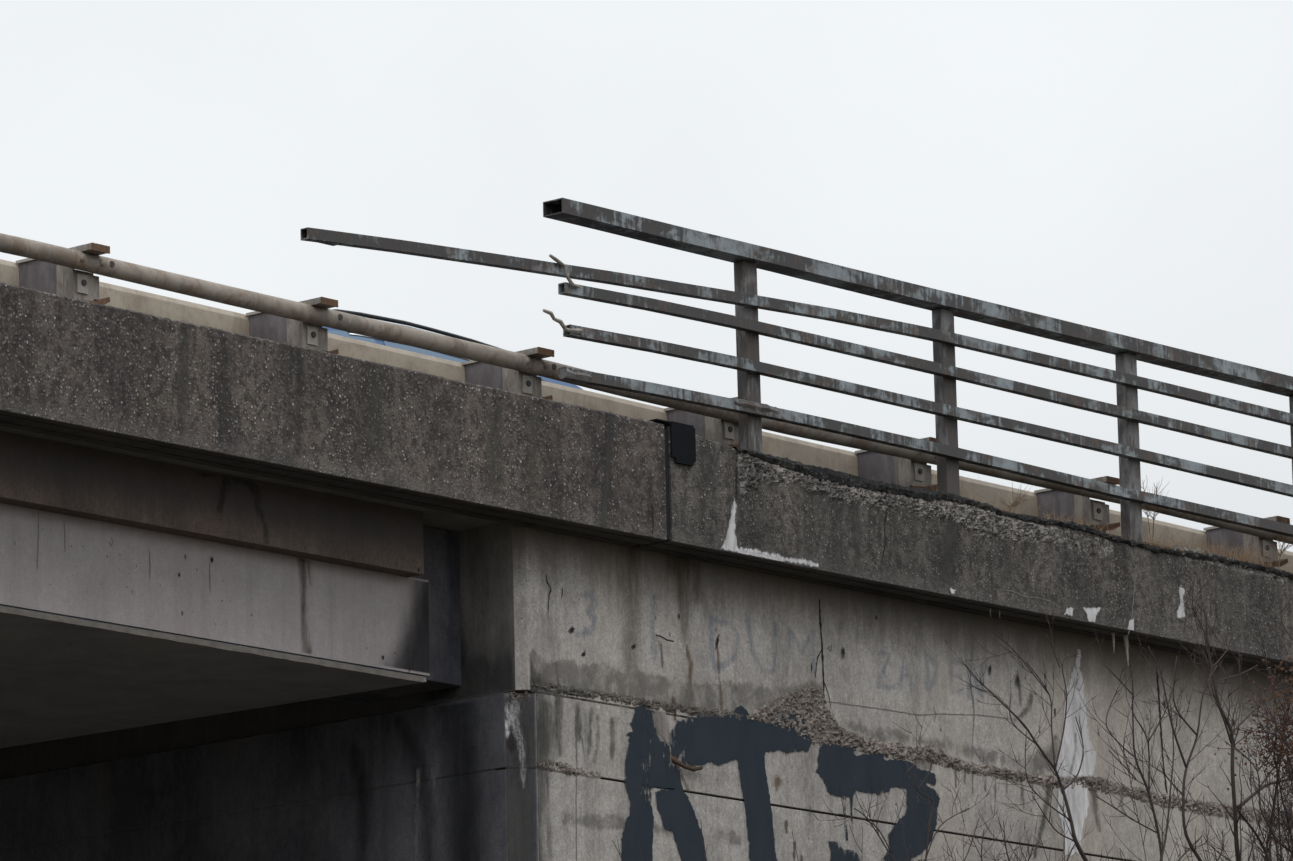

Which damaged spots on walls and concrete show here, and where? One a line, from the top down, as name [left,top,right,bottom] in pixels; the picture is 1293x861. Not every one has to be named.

spalling [736,448,1113,557]
spalling [1174,544,1288,584]
spalling [530,662,1293,829]